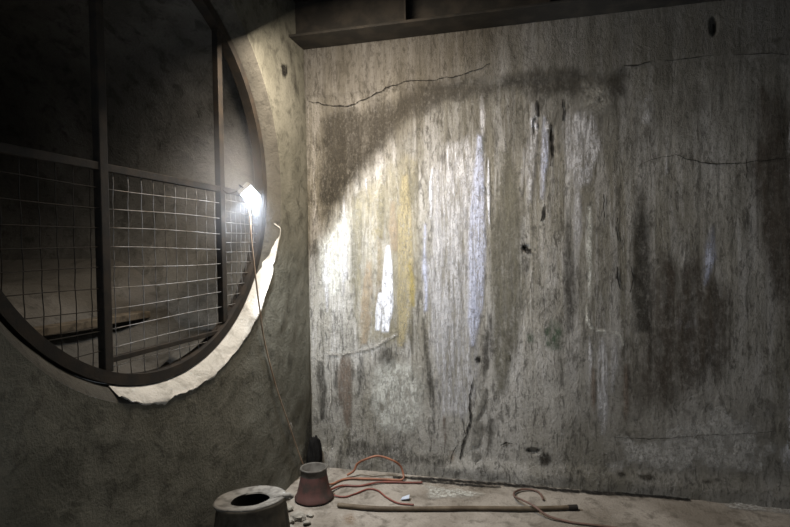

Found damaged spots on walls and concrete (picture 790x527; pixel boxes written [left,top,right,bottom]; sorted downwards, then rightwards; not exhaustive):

water stain [506,70,624,96]
water stain [321,82,485,346]
water stain [423,110,520,416]
water stain [528,117,548,200]
water stain [564,197,591,322]
water stain [633,208,726,404]
water stain [374,364,419,429]
crack [393,378,691,501]